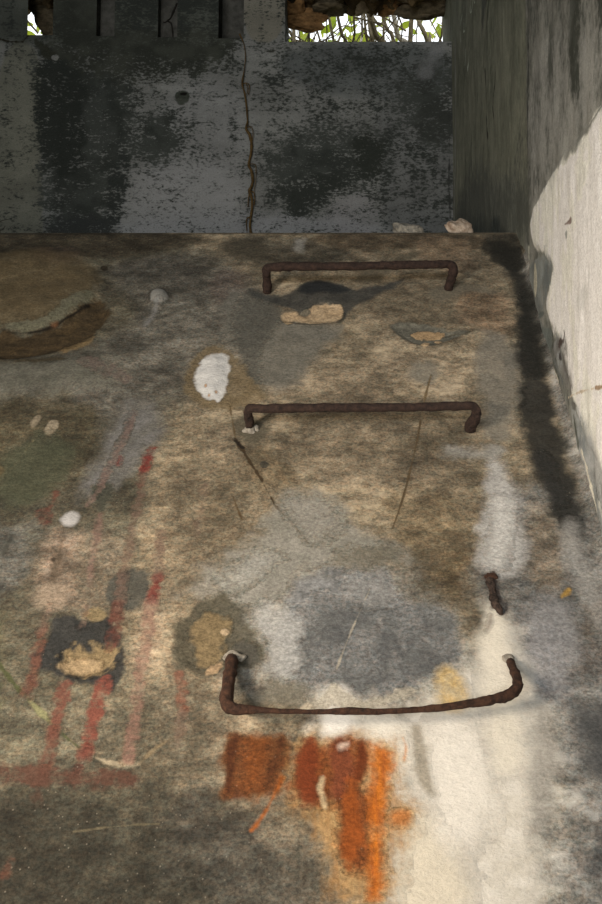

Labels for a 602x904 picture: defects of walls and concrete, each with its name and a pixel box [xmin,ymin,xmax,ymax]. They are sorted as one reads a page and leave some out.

water stain [20,0,247,233]
peeling [0,298,114,364]
spalling [279,302,345,325]
water stain [212,247,425,399]
water stain [250,48,602,641]
spalling [388,321,472,347]
spalling [27,576,129,693]
spalling [167,591,272,686]
corrosion [429,660,473,718]
corrosion [213,722,433,904]